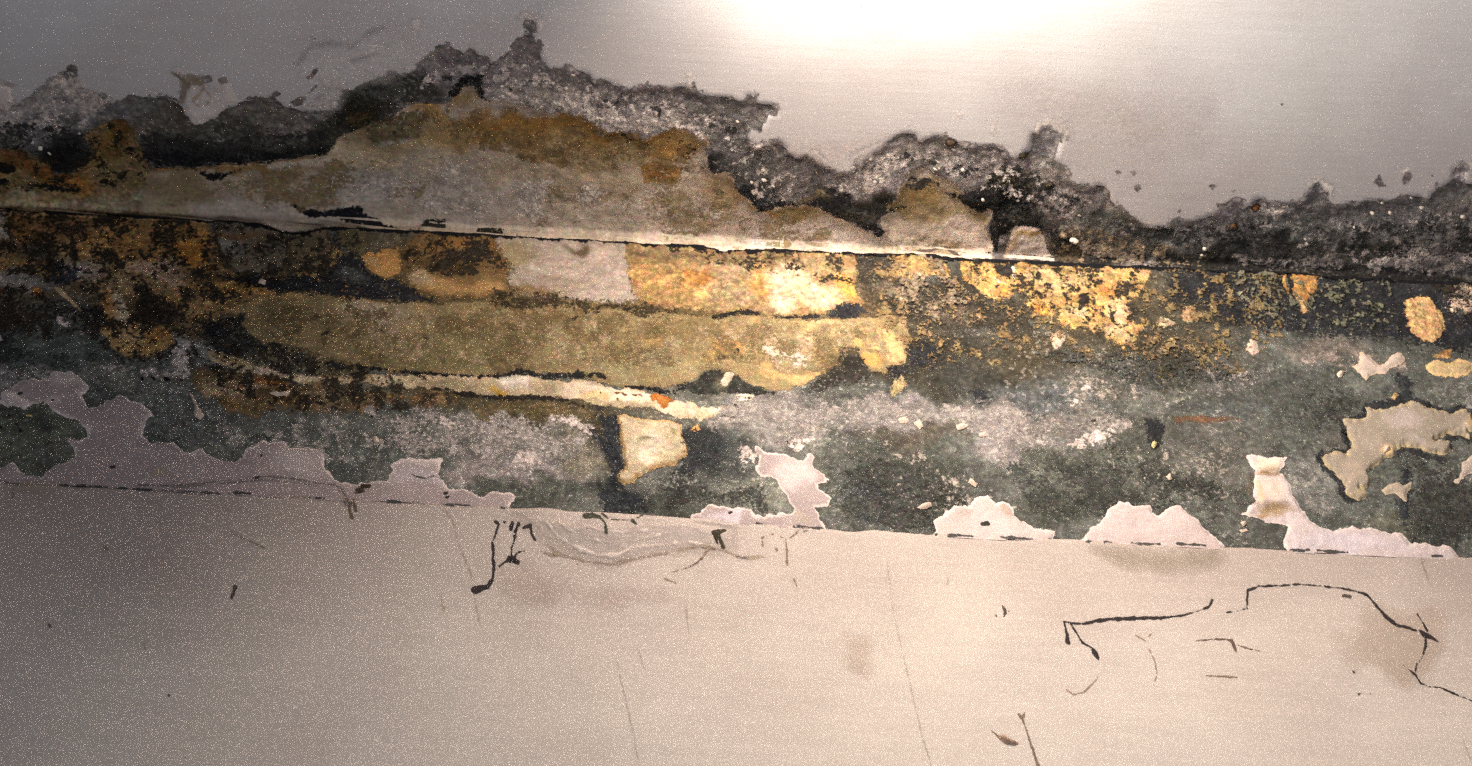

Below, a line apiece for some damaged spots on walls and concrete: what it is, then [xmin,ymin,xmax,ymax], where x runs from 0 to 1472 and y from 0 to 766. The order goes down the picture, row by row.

peeling [169,67,240,125]
crack [0,207,1472,285]
damp [0,11,1472,558]
flaking render [0,85,1472,508]
crack [59,474,536,611]
peeling [691,446,832,529]
crack [664,522,1051,586]
peeling [918,478,1055,542]
peeling [1082,501,1225,550]
peeling [1239,454,1458,560]
crack [1063,540,1472,701]